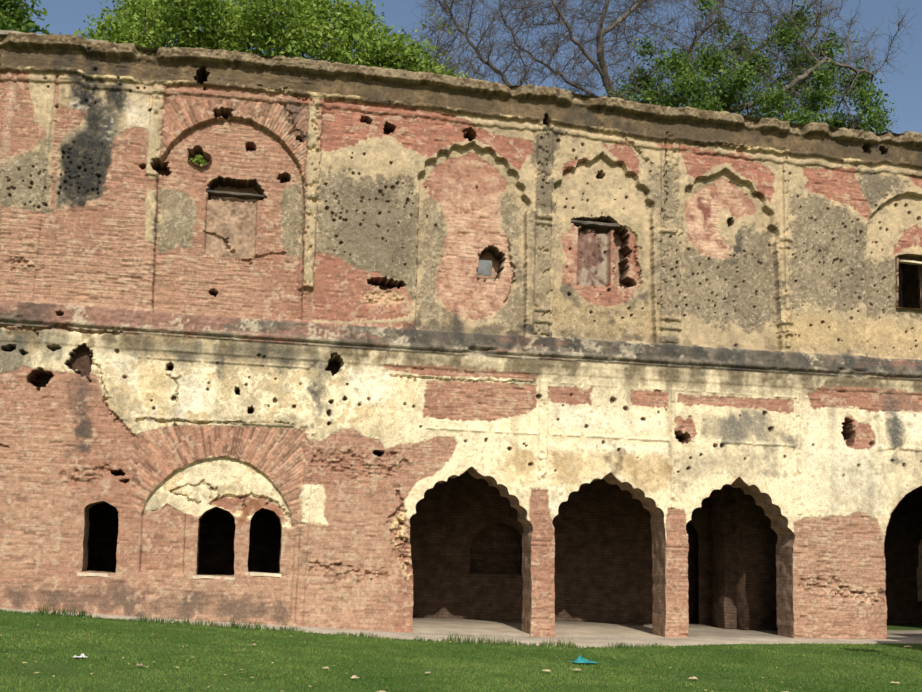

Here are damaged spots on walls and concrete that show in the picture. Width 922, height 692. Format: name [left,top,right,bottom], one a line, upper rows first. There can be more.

damp [70,51,95,103]
damp [107,83,124,108]
peeling [0,72,152,214]
damp [61,113,108,206]
spalling [313,97,535,322]
crack [202,229,288,265]
spalling [27,367,55,391]
spalling [47,343,94,382]
spalling [384,363,593,422]
spalling [631,389,797,444]
spalling [808,385,922,450]
crack [168,478,293,518]